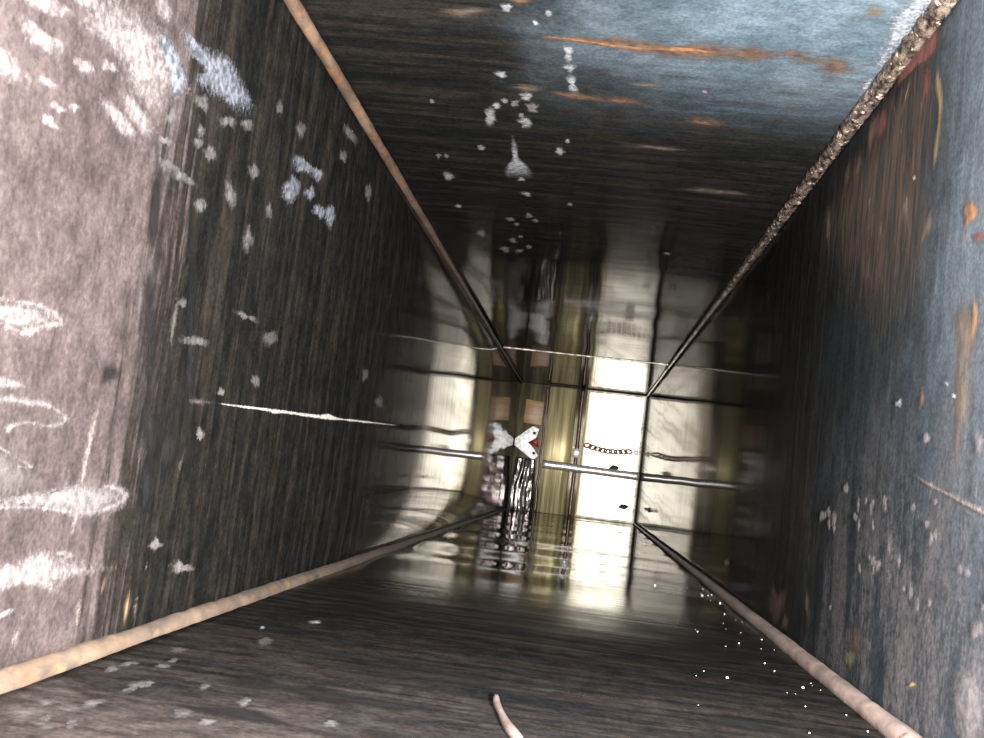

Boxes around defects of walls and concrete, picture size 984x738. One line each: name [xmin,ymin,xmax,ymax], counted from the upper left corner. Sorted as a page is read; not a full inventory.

corrosion [544,37,849,73]
leakage [149,163,161,248]
corrosion [964,201,984,242]
leakage [103,366,116,382]
leakage [139,274,175,513]
corrosion [956,300,978,427]